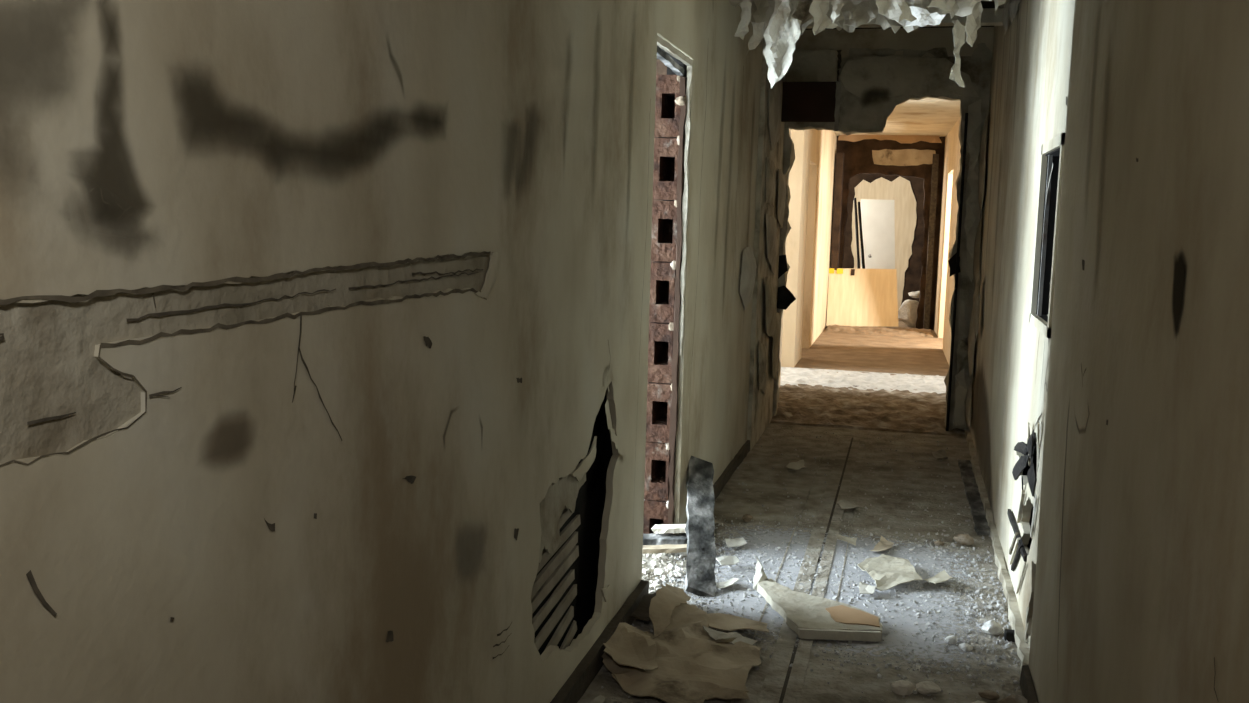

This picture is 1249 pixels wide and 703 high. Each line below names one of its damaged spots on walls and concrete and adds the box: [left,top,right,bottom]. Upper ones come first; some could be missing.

damp [104,10,117,48]
damp [83,68,146,220]
damp [181,78,400,172]
spalling [758,49,988,429]
spalling [0,251,499,467]
spalling [531,366,629,651]
spalling [1007,421,1040,594]